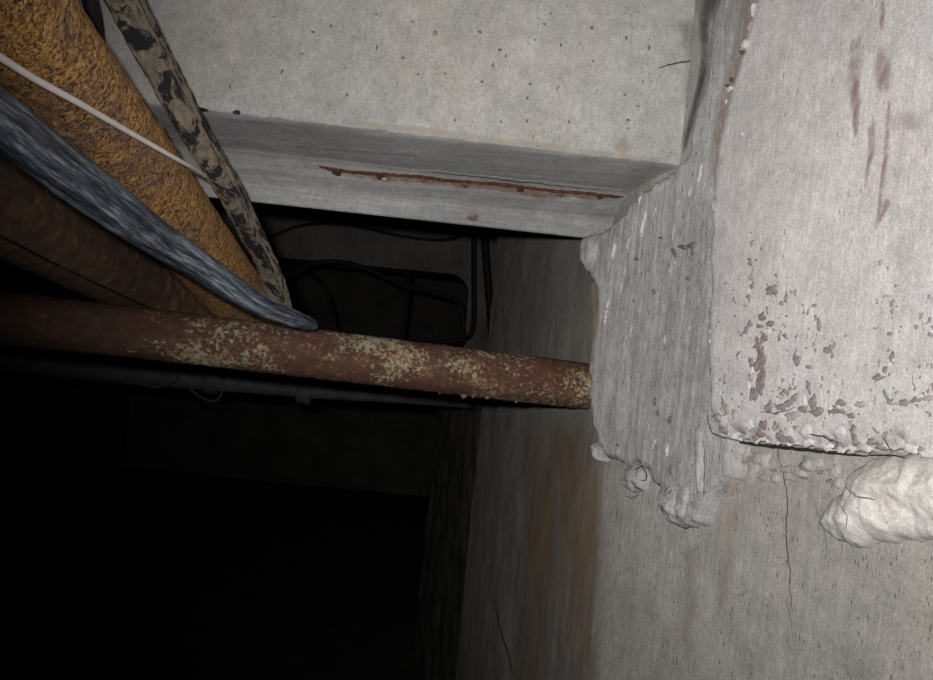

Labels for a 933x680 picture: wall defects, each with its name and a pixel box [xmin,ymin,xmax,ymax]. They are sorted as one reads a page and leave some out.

spalling [715,0,757,151]
spalling [707,273,933,489]
crack [739,441,906,642]